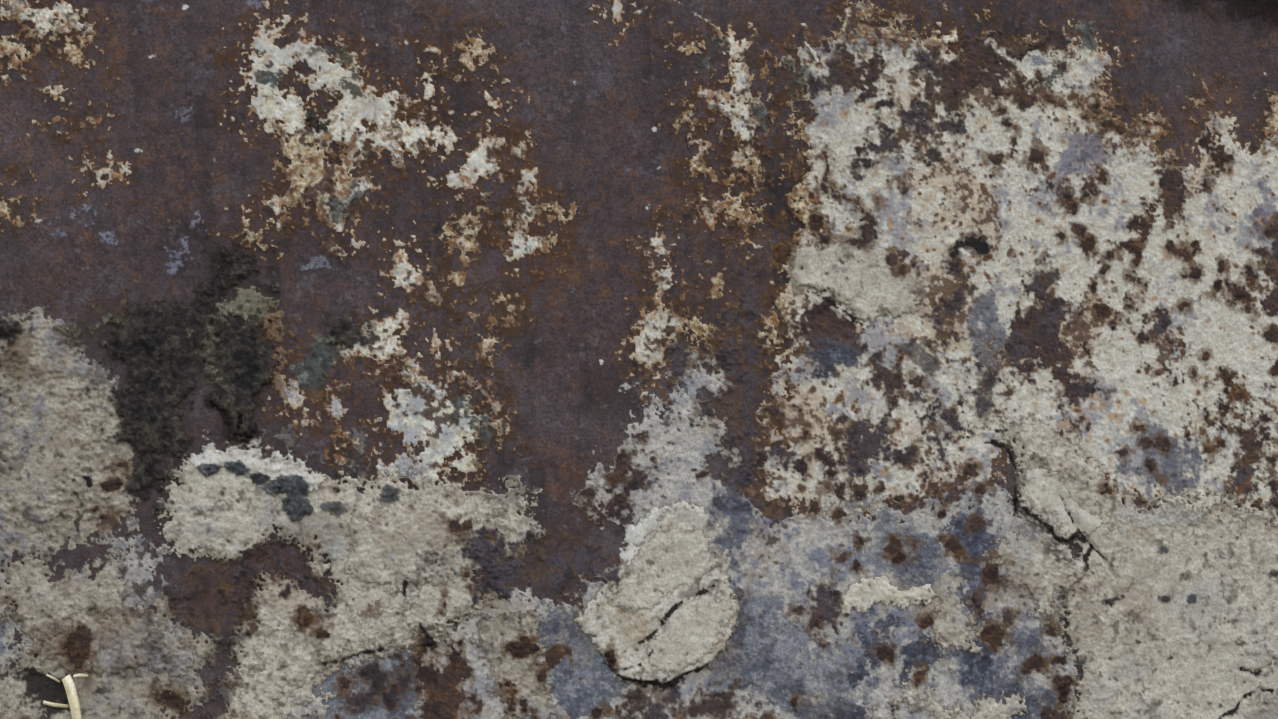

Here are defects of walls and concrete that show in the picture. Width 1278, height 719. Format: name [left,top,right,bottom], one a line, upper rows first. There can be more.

peeling [588,0,664,47]
peeling [189,0,585,492]
peeling [614,0,1278,536]
rust [690,27,1278,652]
crack [984,428,1107,574]
peeling [417,509,522,595]
spalling [11,667,70,719]
rust [334,626,538,719]
rust [501,631,572,683]
rust [604,644,618,669]
rust [876,643,897,666]
rust [1018,652,1088,719]